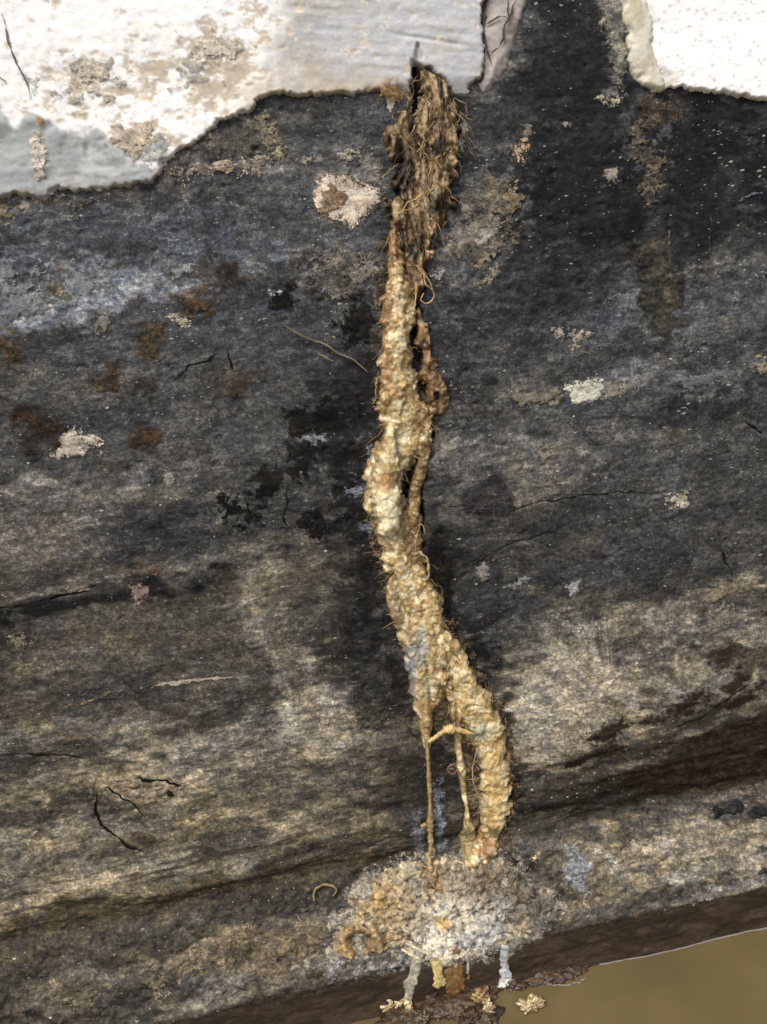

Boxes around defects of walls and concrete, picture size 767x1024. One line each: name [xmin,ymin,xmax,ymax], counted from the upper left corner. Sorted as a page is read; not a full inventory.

peeling [0,0,526,202]
peeling [647,0,767,101]
crack [461,491,677,569]
leakage [175,220,767,1024]
crack [93,777,186,854]